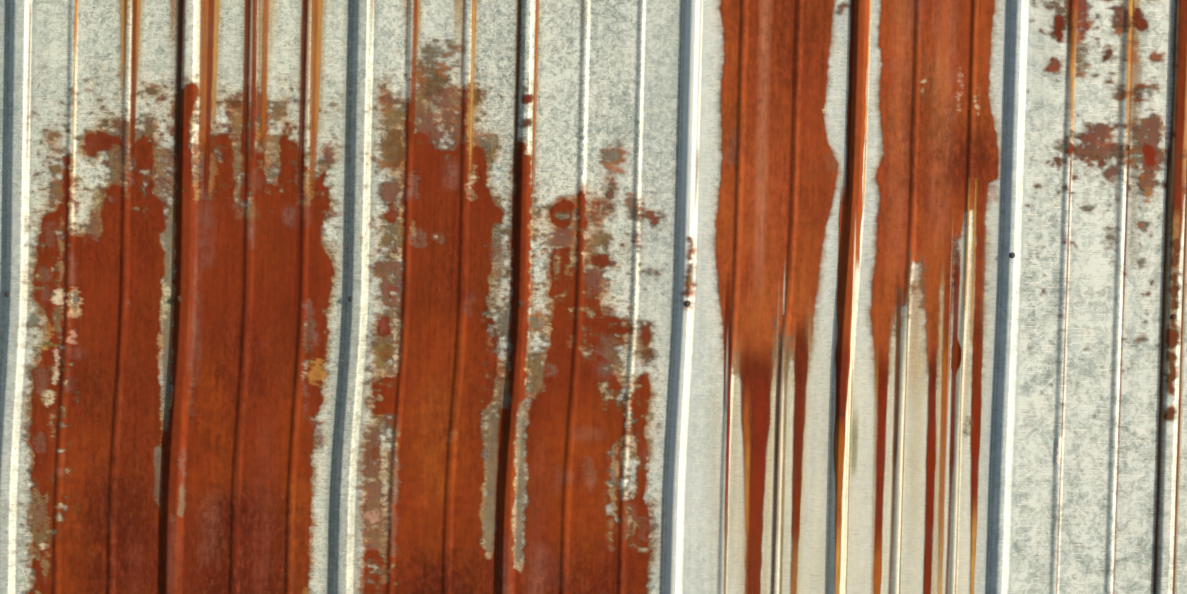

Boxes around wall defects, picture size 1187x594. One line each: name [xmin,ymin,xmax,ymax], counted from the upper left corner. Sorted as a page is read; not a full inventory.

corrosion [24,0,336,594]
corrosion [359,0,657,594]
corrosion [638,203,662,227]
corrosion [715,0,1000,594]
corrosion [1033,0,1187,594]